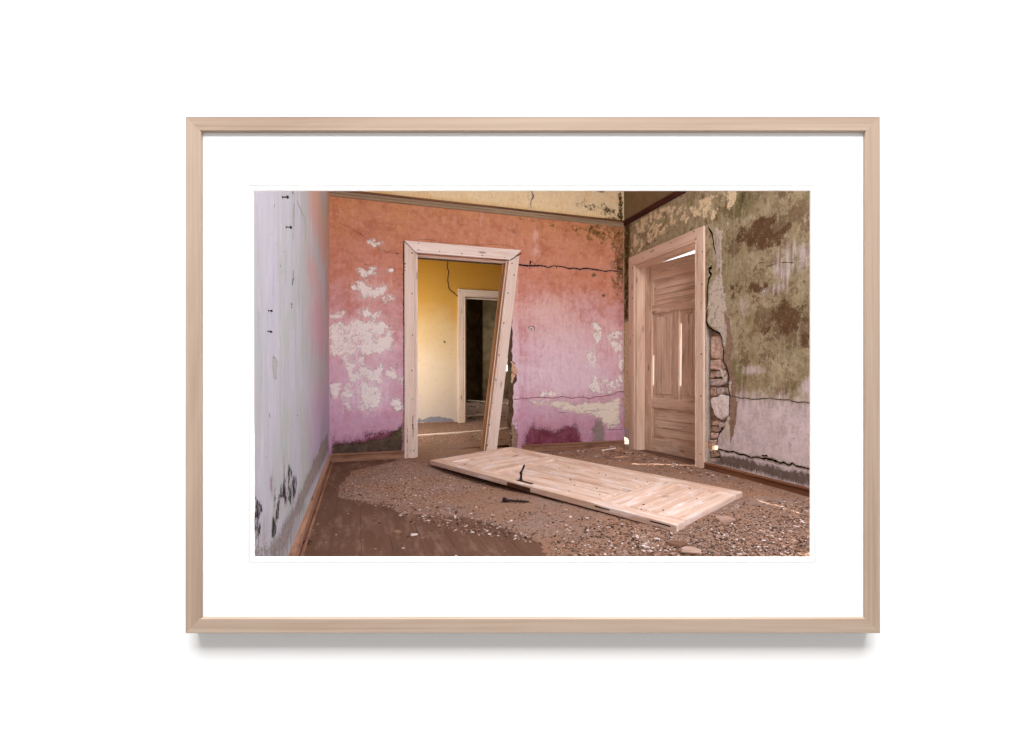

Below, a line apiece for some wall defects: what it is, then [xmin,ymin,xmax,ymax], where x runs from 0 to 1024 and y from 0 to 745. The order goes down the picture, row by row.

damp [735,214,791,250]
crack [487,244,623,273]
peeling [329,266,404,417]
crack [338,221,461,389]
flaking render [630,191,738,463]
damp [730,282,768,300]
damp [760,297,810,348]
peeling [527,321,629,430]
damp [525,421,605,445]
crack [717,448,810,470]
damp [254,416,454,557]